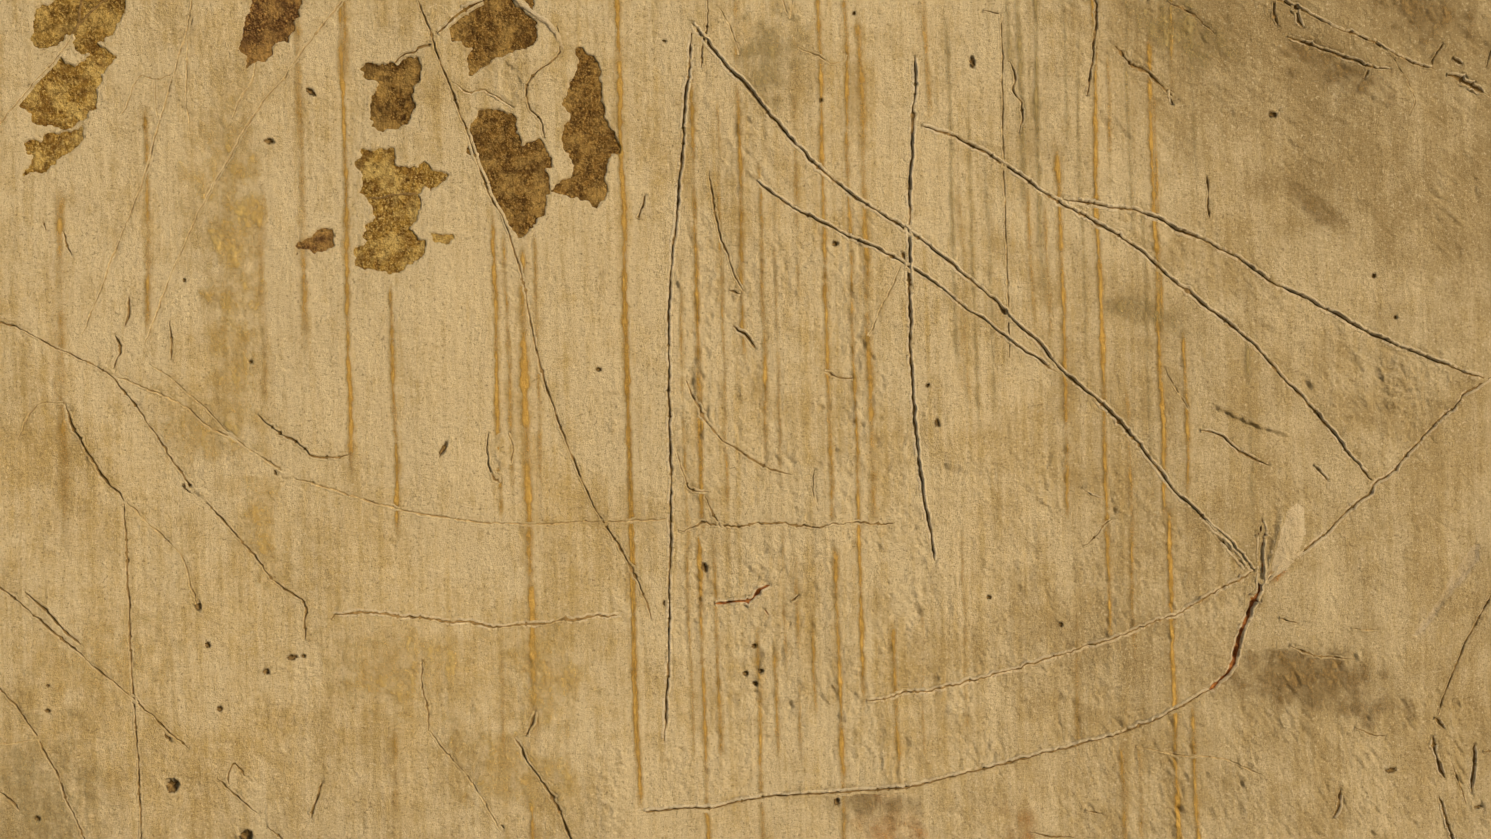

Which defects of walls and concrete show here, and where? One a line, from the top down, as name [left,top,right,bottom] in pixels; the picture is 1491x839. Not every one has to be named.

peeling [19,0,126,176]
crack [0,400,199,839]
peeling [238,0,302,69]
rust [338,2,354,458]
peeling [353,54,454,275]
crack [0,0,895,639]
rust [491,225,540,719]
peeling [448,0,621,238]
rust [614,0,643,800]
rust [848,190,875,691]
crack [983,8,1026,357]
crack [1085,0,1177,104]